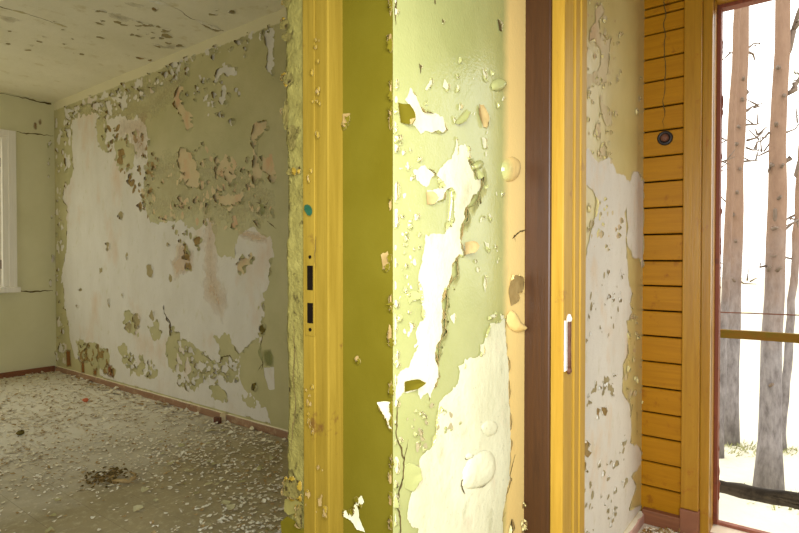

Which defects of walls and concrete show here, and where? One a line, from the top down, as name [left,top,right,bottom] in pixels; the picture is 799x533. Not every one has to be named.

crack [0,6,66,27]
peeling [47,0,312,425]
spalling [281,476,327,530]
peeling [377,78,527,533]
peeling [584,0,644,533]